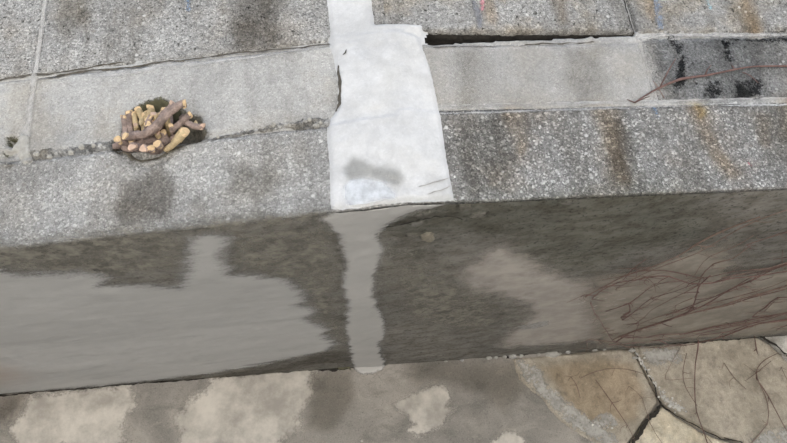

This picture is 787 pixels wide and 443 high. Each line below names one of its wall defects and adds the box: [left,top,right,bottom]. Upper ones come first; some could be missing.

spalling [133,97,169,131]
crack [0,43,347,111]
spalling [26,109,330,163]
mould [667,33,686,89]
water stain [705,78,787,106]
water stain [0,209,342,338]